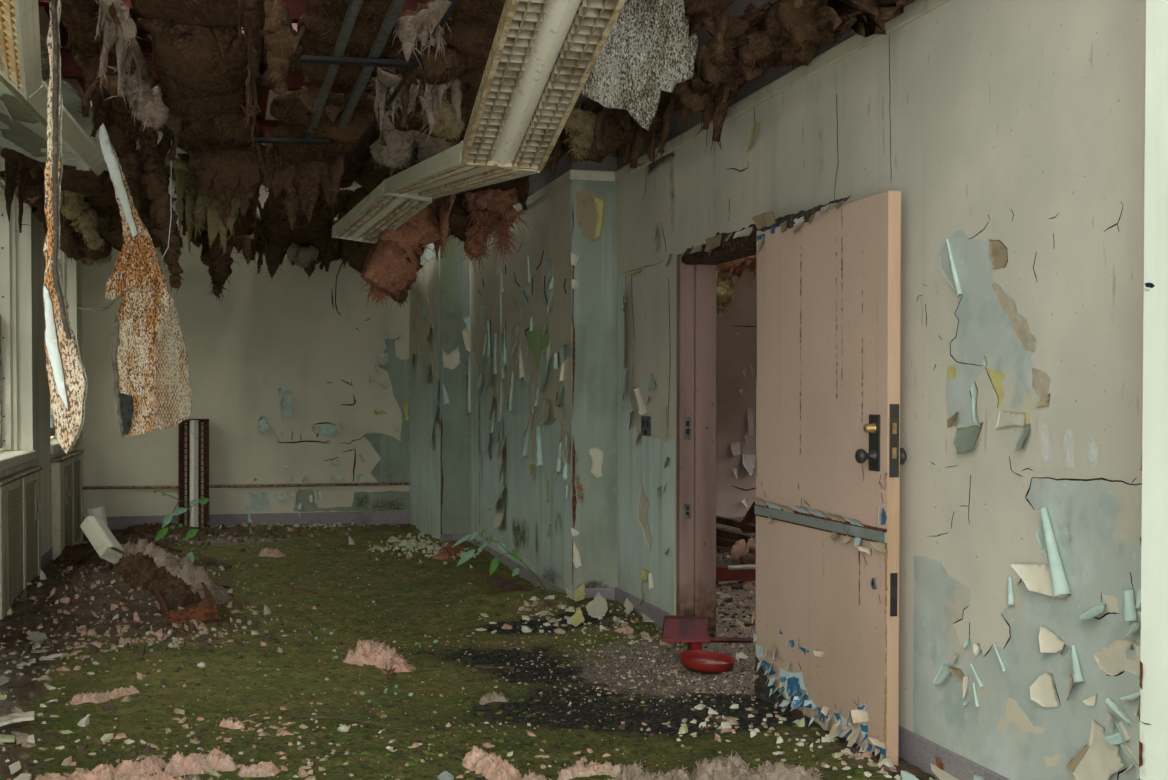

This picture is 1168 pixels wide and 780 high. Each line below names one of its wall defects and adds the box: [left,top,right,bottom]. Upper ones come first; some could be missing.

peeling [206,182,605,583]
peeling [475,195,851,646]
peeling [731,365,887,566]
crack [1009,456,1142,485]
peeling [667,611,938,780]
peeling [913,478,1143,780]